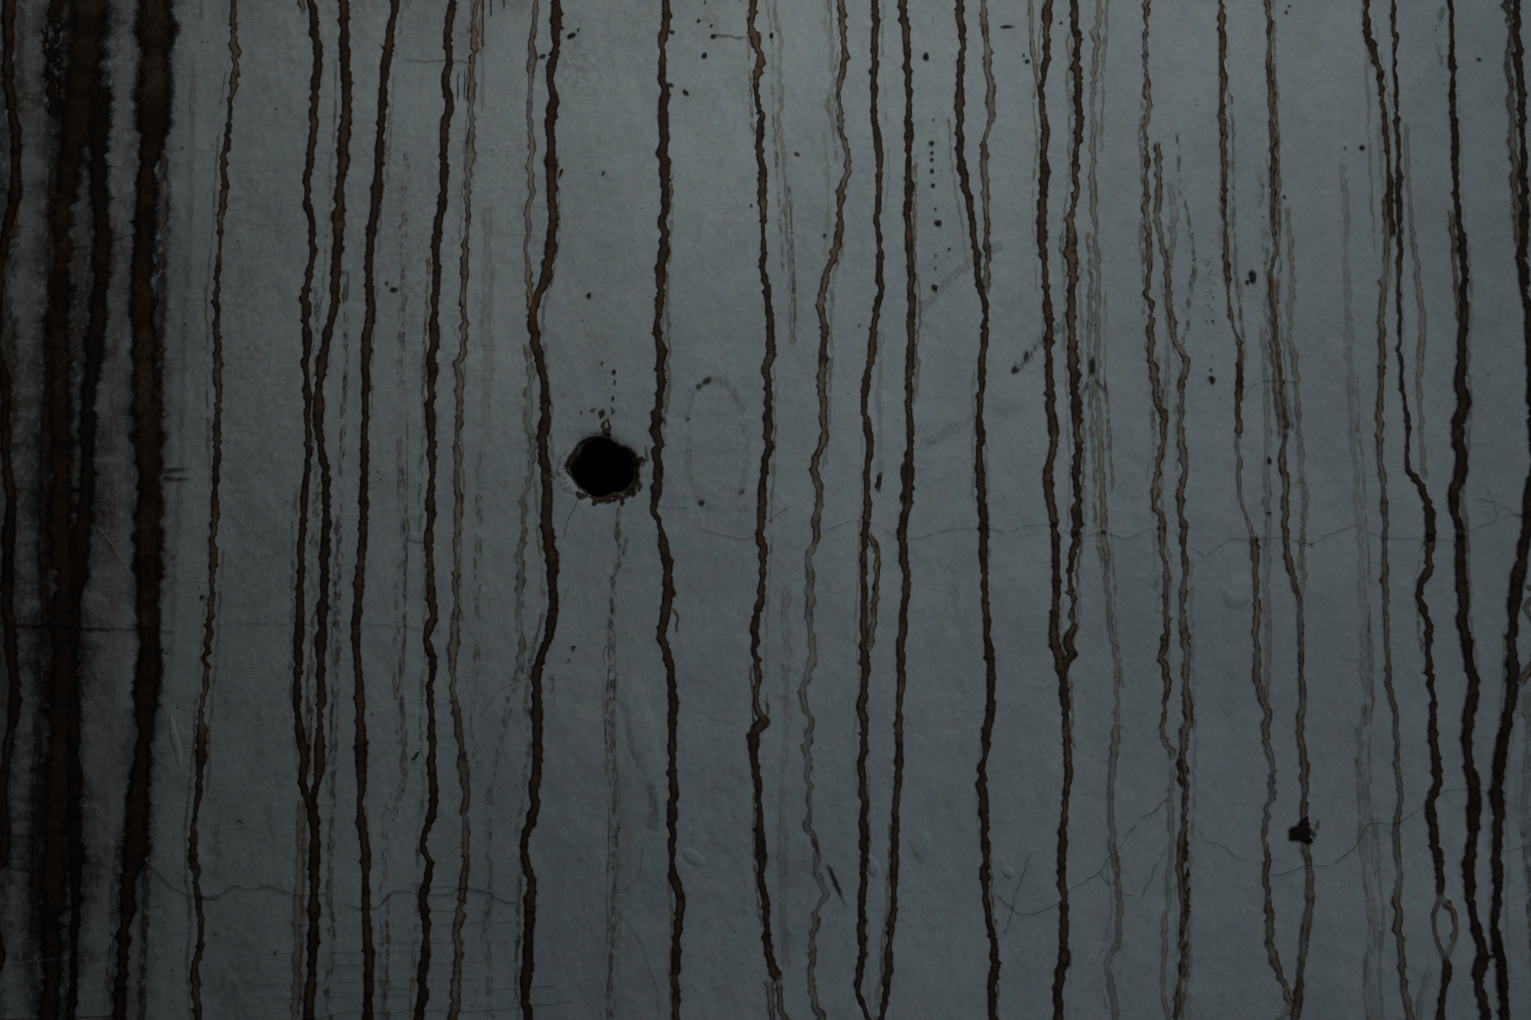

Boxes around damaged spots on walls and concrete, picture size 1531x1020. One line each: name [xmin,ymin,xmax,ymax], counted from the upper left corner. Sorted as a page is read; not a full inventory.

corrosion [289,0,402,1020]
corrosion [393,0,481,1020]
corrosion [514,0,564,1020]
spalling [564,410,645,506]
corrosion [649,0,686,1020]
corrosion [746,0,790,1020]
corrosion [798,676,814,832]
corrosion [808,895,829,1020]
corrosion [804,0,852,638]
corrosion [949,0,1002,1020]
corrosion [1028,0,1115,1020]
corrosion [1139,0,1197,1020]